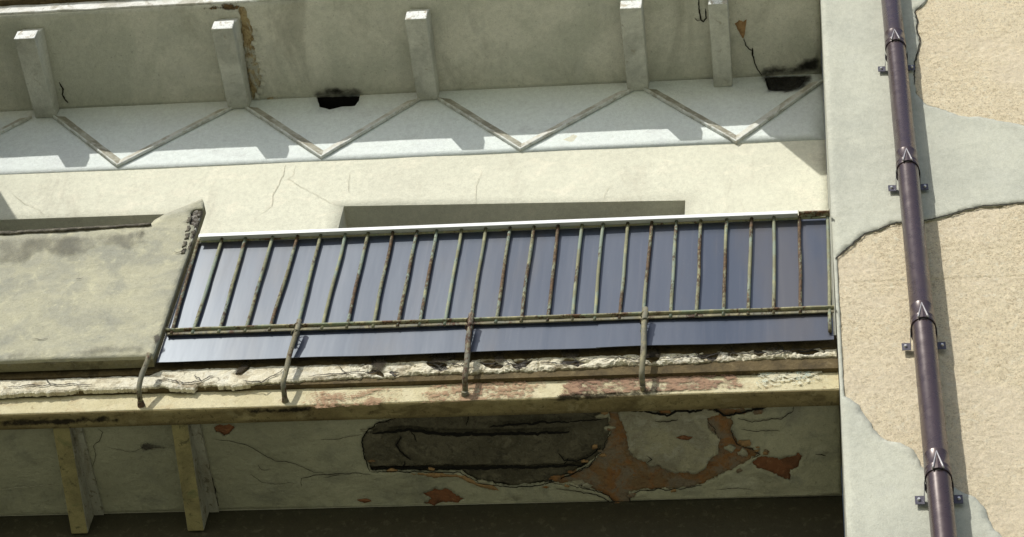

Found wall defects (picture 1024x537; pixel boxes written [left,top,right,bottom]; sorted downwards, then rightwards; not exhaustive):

peeling [237,6,278,100]
hole [315,88,359,110]
hole [763,59,819,92]
peeling [915,0,1024,126]
spalling [479,360,532,370]
crack [216,439,370,486]
spalling [360,408,802,505]